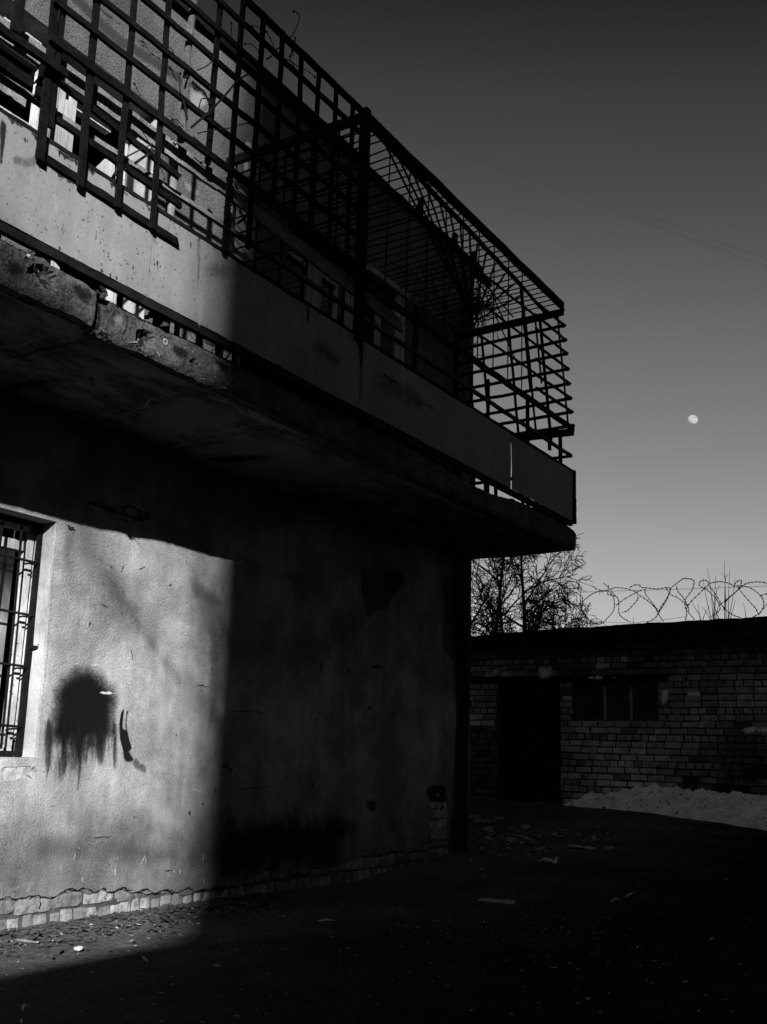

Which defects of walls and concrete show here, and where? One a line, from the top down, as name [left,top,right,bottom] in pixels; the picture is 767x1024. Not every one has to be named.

spalling [137,329,154,357]